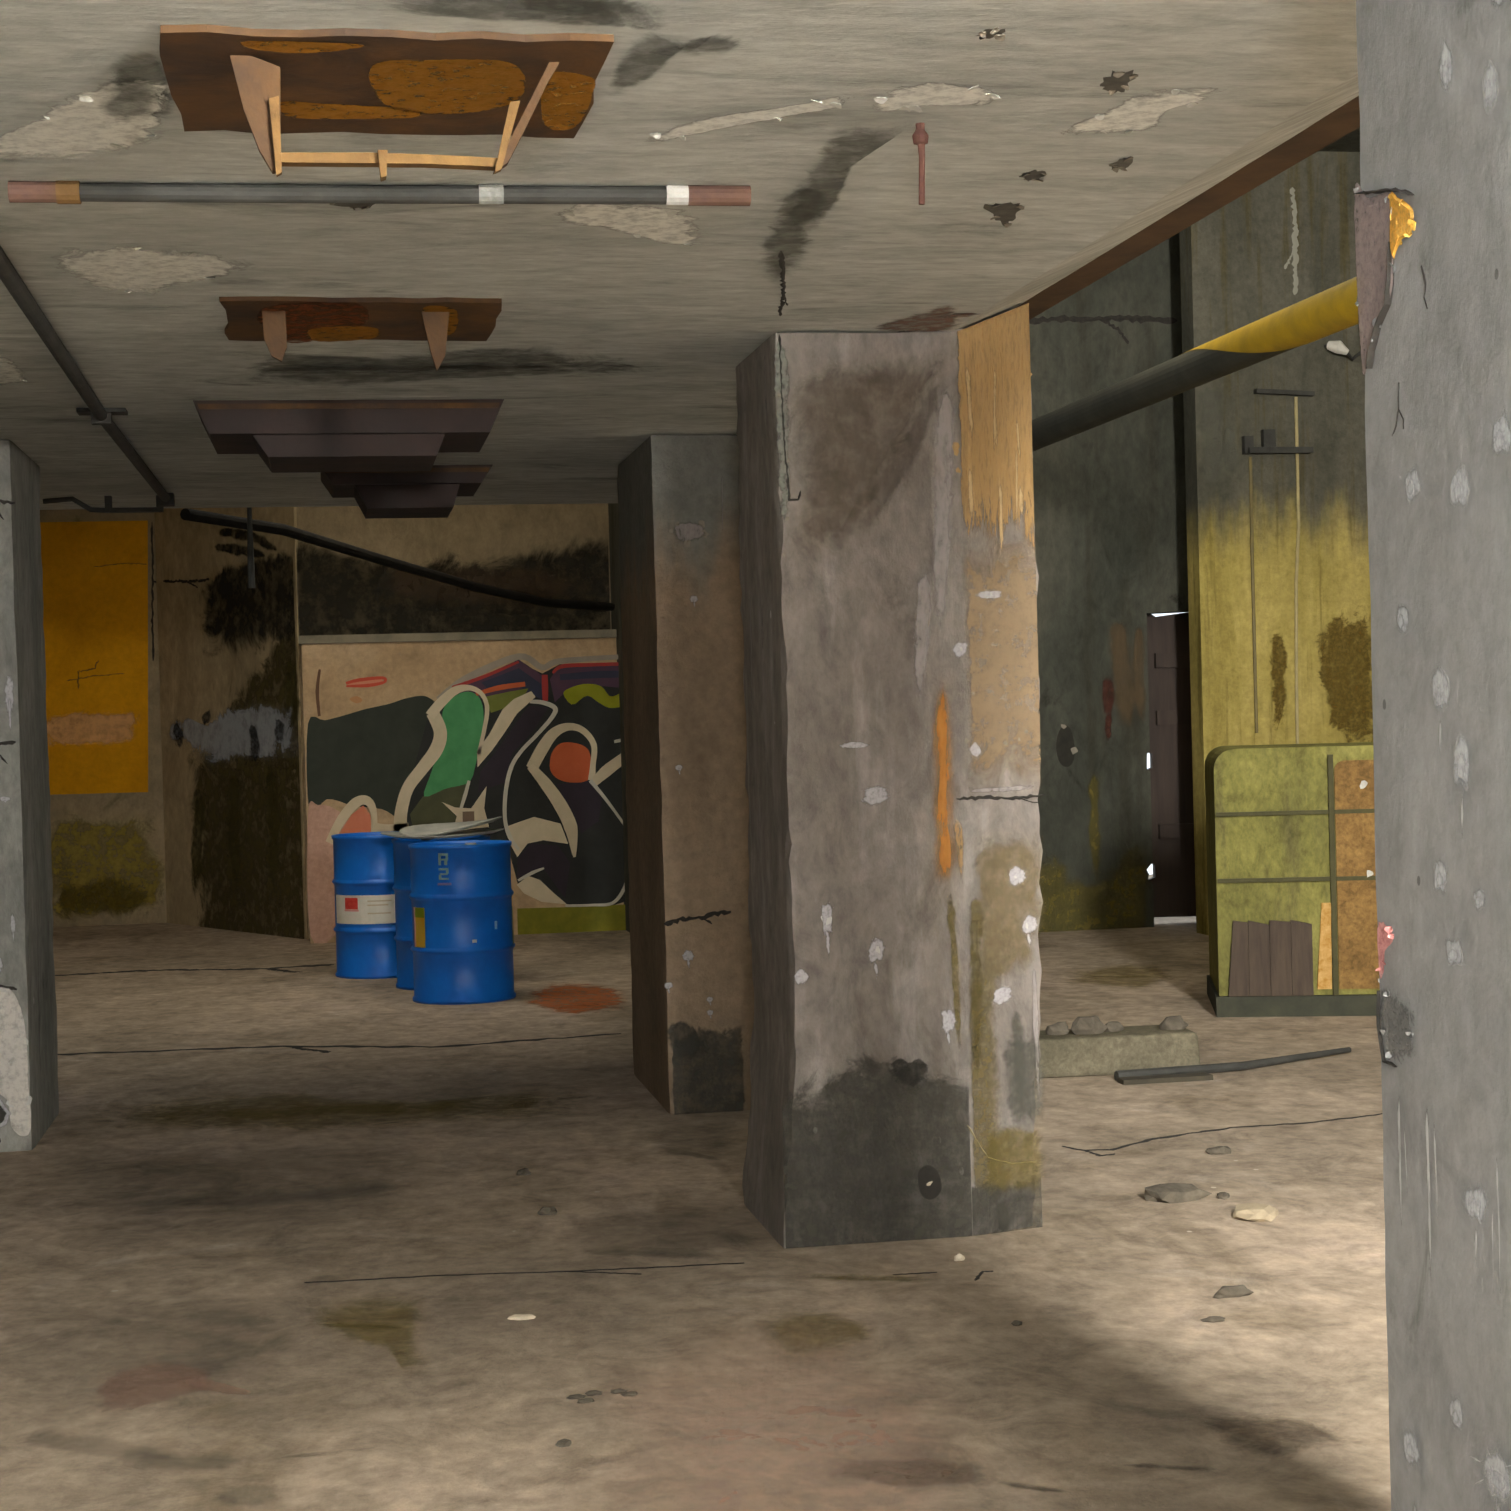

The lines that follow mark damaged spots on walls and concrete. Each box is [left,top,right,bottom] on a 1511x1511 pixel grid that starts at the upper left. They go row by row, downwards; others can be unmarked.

peeling [0,80,169,160]
peeling [1072,70,1211,134]
crack [764,251,788,316]
spalling [1353,183,1416,375]
leakage [1317,612,1373,743]
leakage [170,632,304,939]
rust [935,692,963,875]
crack [956,786,1045,803]
crack [664,910,731,926]
rust [947,901,961,1042]
spalling [0,987,32,1142]
leakage [782,1055,1042,1249]